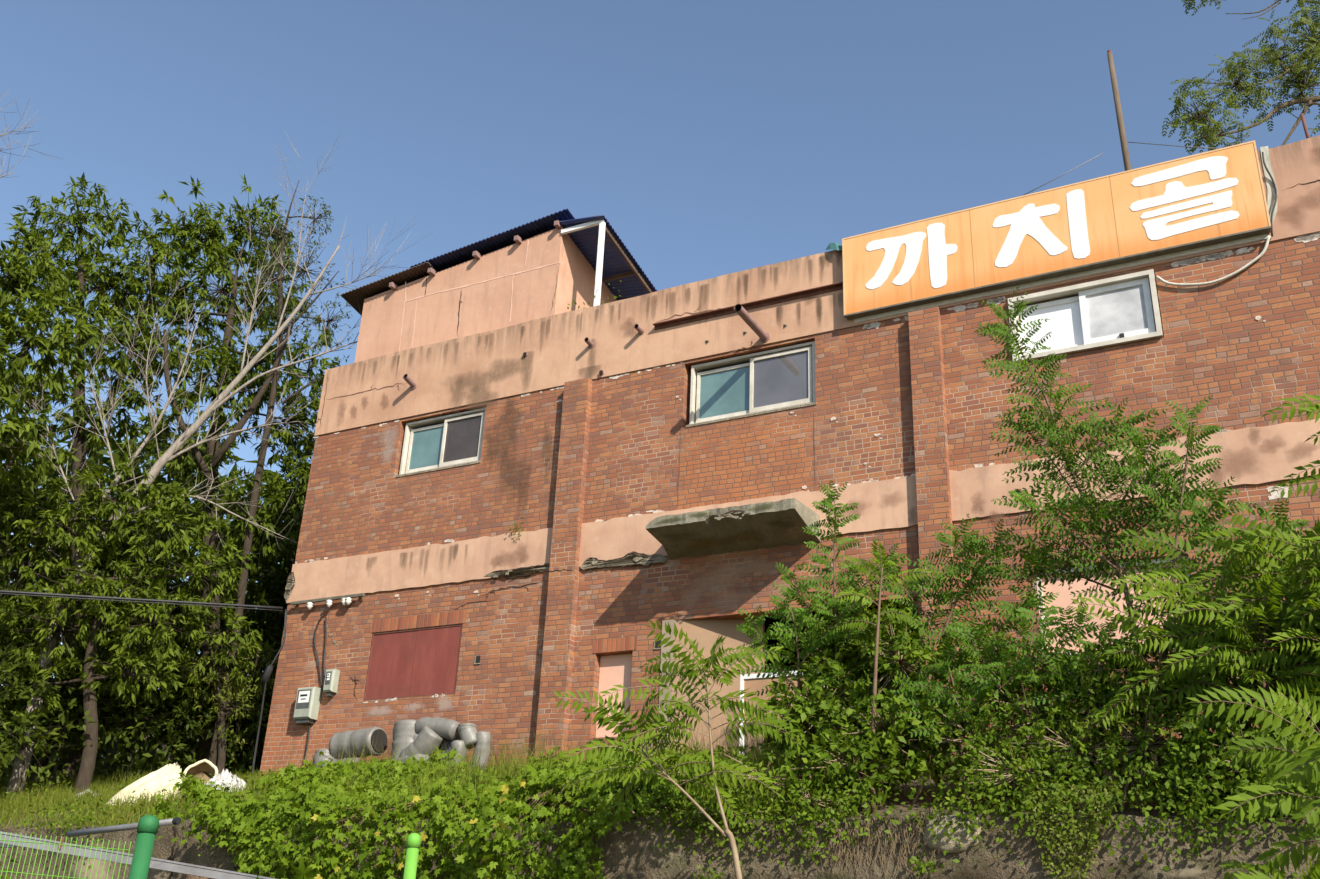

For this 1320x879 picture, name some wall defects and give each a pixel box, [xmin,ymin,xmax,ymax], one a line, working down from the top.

spalling [580,551,667,570]
spalling [485,563,550,578]